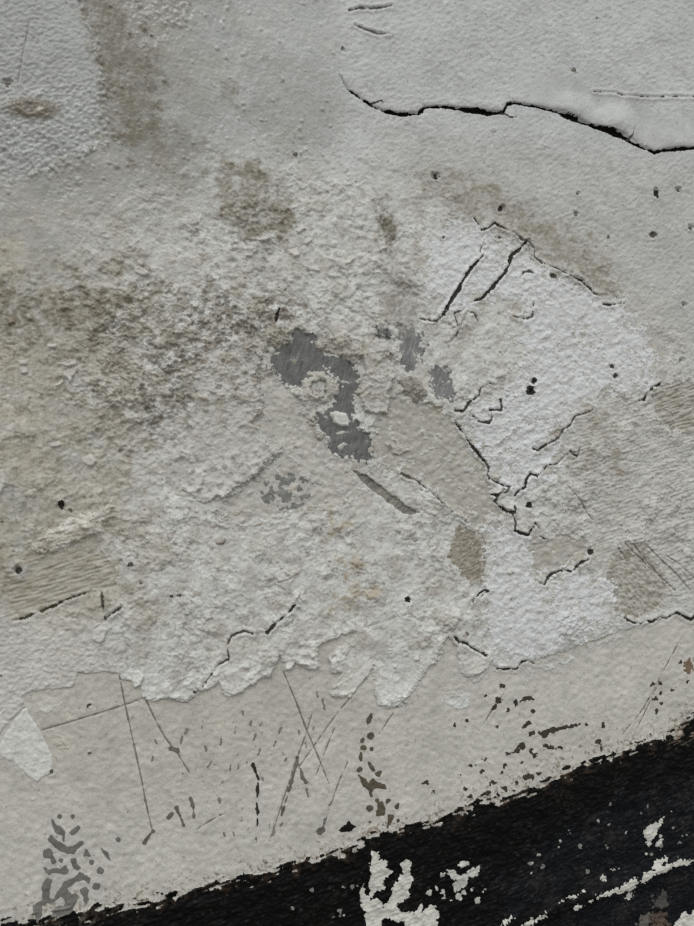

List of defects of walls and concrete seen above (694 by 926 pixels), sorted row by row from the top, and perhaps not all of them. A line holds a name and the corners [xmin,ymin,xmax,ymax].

crack [343,83,694,155]
damp [0,0,357,374]
crack [442,217,625,338]
peeling [54,359,79,387]
peeling [649,378,694,437]
flaking render [156,314,594,585]
crack [400,473,448,507]
crack [454,399,538,536]
crack [532,442,580,457]
crack [540,559,589,585]
crack [624,612,694,625]
peeling [0,540,694,926]